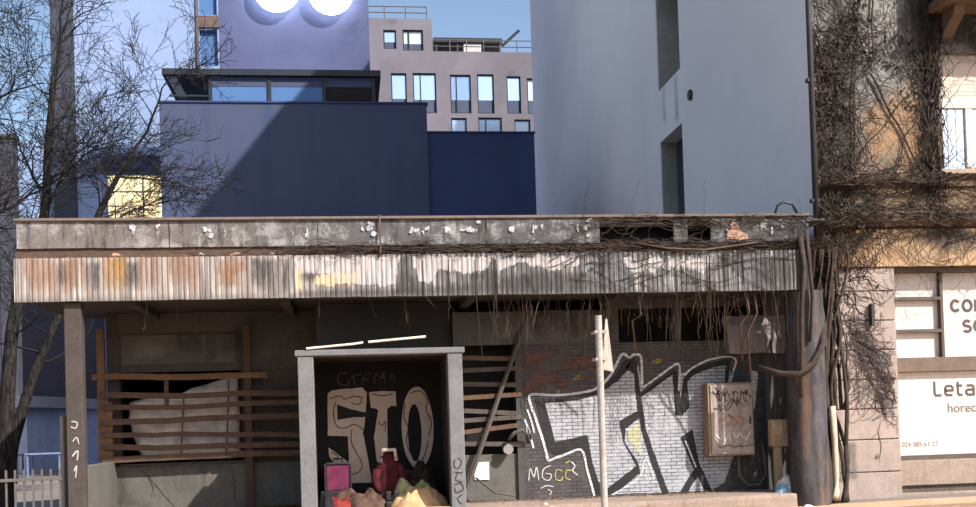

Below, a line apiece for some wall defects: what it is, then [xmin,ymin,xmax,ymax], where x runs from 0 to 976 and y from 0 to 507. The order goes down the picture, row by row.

spalling [725,222,748,241]
peeling [522,348,597,392]
crack [137,467,175,507]